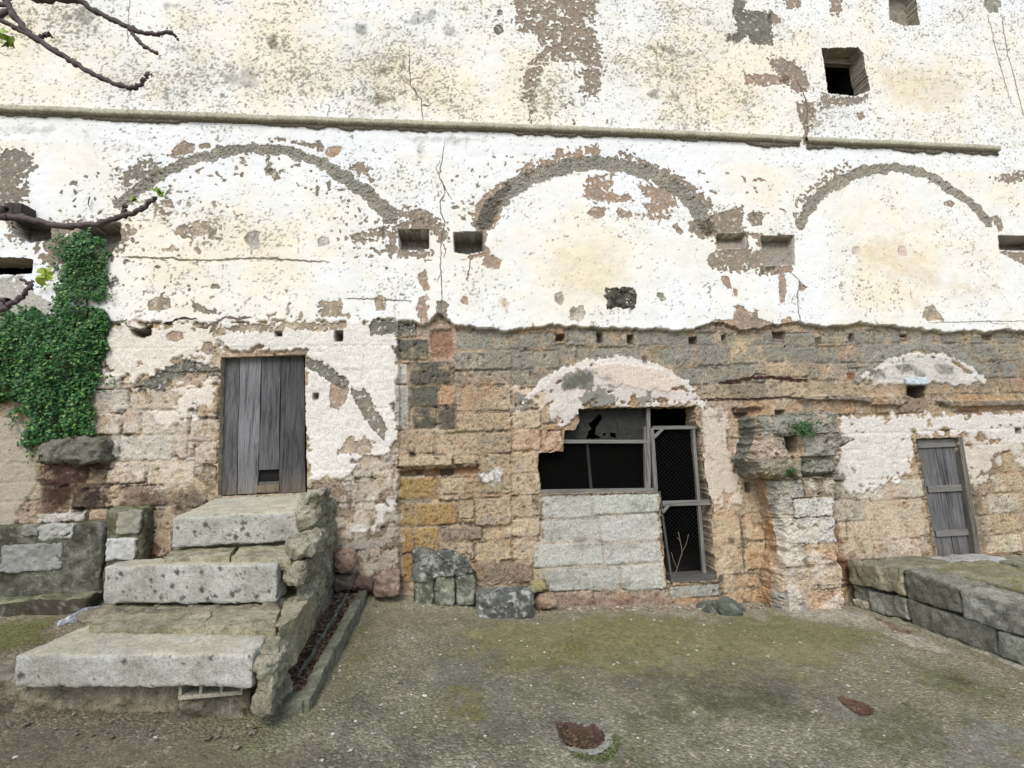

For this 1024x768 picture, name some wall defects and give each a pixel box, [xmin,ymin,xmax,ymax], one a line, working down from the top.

crack [403,51,429,116]
peeling [494,0,607,125]
peeling [726,0,869,145]
peeling [0,140,260,281]
crack [436,142,452,319]
peeling [582,149,856,337]
peeling [136,278,351,395]
peeling [306,357,388,456]